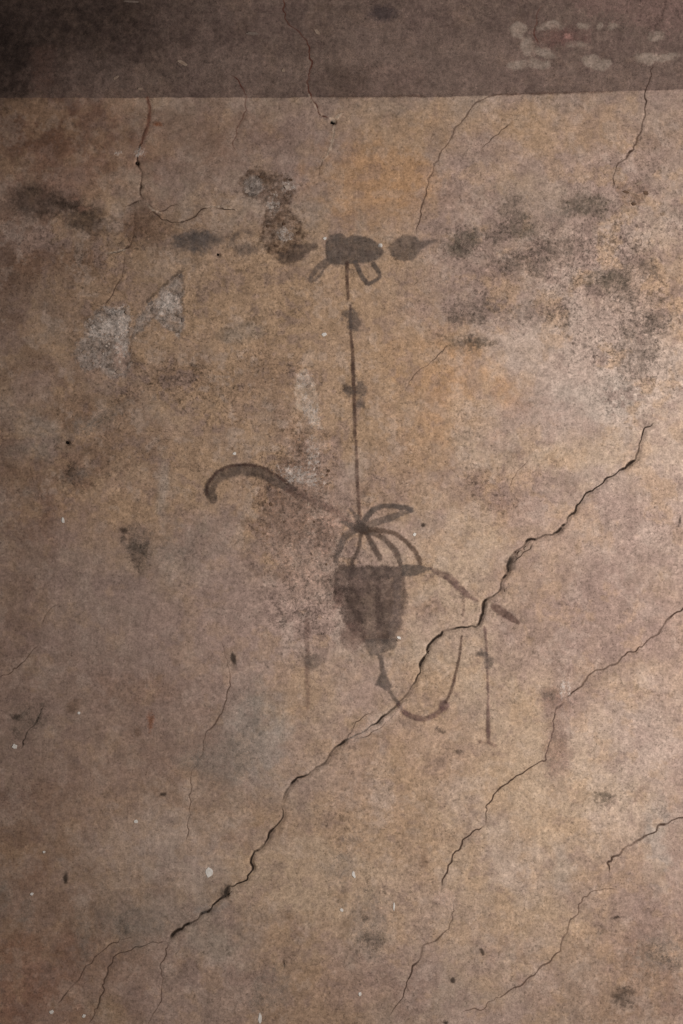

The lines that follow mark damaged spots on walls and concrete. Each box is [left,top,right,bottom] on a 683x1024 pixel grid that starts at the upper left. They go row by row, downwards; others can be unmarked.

crack [133,136,235,223]
flaking render [76,274,185,378]
crack [415,425,652,683]
crack [336,713,389,747]
crack [442,683,581,883]
crack [61,810,284,1006]
crack [395,962,418,1007]
crack [479,952,559,1011]